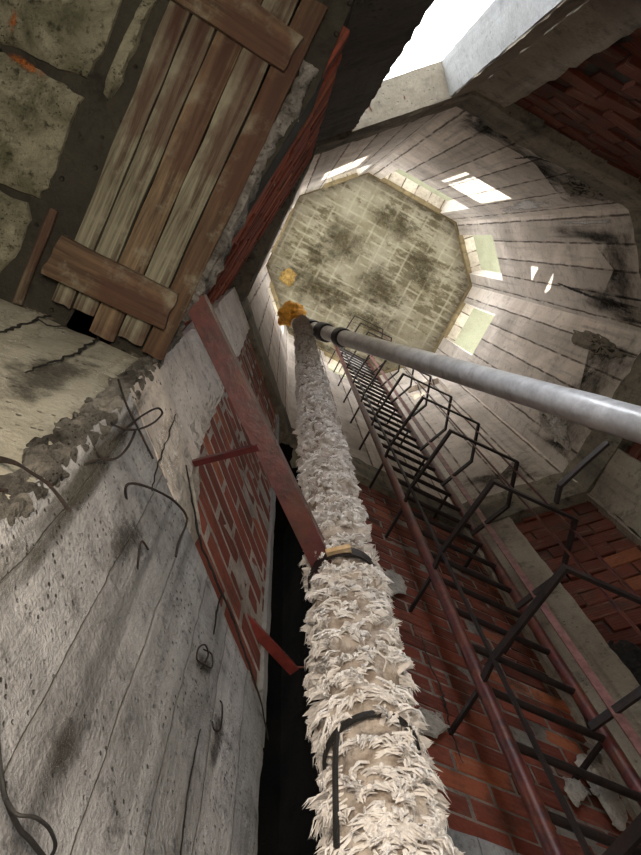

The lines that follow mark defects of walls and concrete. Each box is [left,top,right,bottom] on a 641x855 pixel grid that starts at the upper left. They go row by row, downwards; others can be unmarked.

damp [376,211,409,241]
crack [0,315,67,333]
spalling [0,60,319,544]
mould [297,220,357,306]
damp [361,272,394,303]
damp [559,219,641,324]
crack [24,336,100,374]
damp [574,341,622,394]
spalling [563,742,628,831]